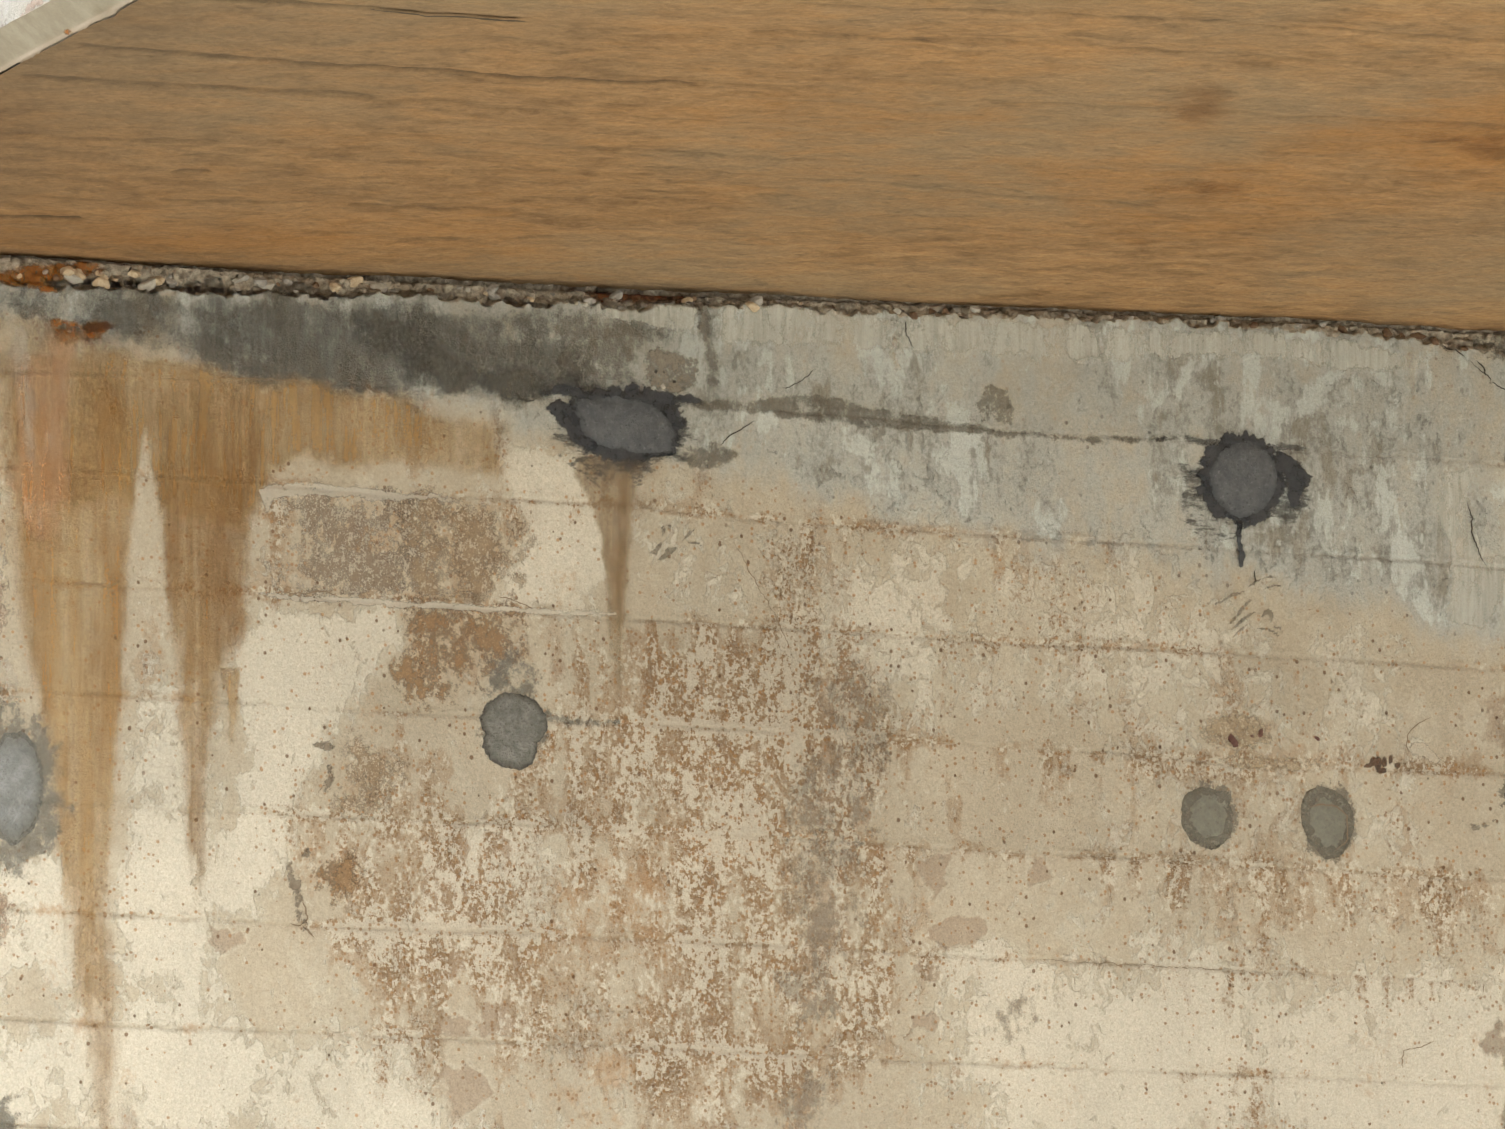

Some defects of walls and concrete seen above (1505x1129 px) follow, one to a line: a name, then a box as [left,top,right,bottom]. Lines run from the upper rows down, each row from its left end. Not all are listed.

corrosion [0,261,104,293]
spalling [0,255,1505,360]
crack [1442,345,1505,390]
corrosion [578,457,635,622]
corrosion [3,319,497,995]